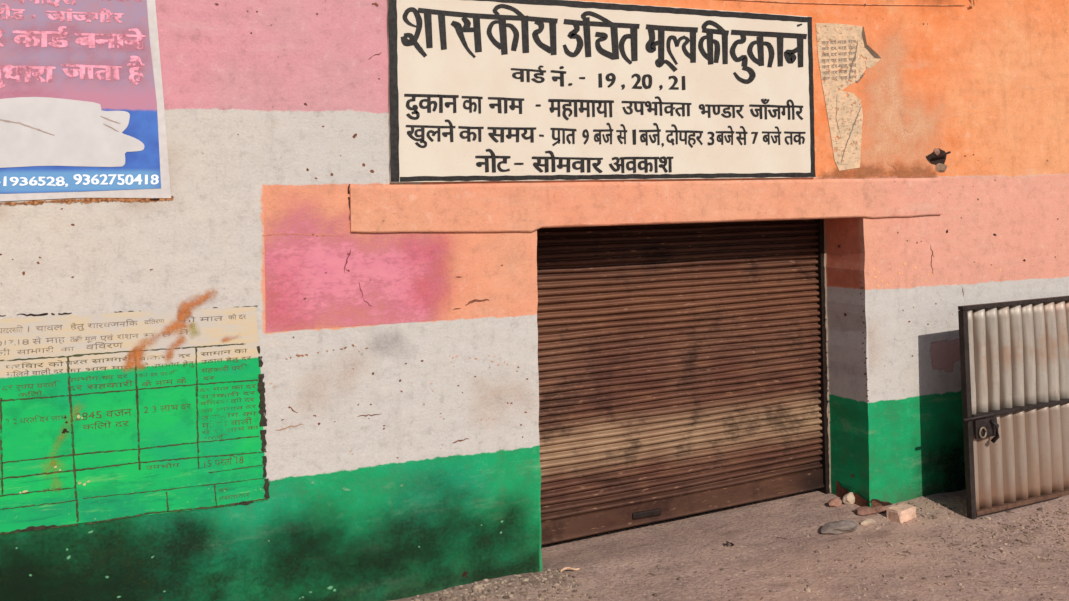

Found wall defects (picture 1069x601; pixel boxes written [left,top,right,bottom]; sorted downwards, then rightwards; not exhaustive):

damp [0,522,208,601]
damp [261,517,440,600]
damp [446,509,540,587]